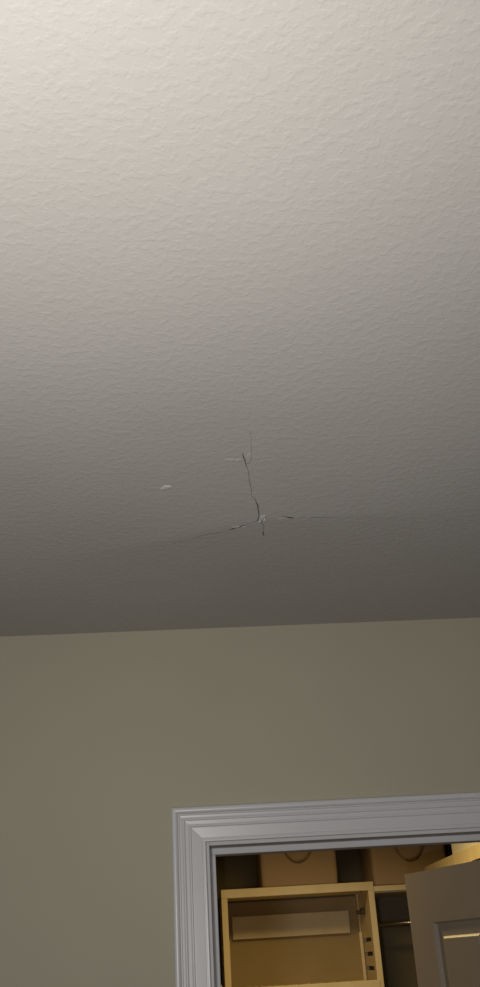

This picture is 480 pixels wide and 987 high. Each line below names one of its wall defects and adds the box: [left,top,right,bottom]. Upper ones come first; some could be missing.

crack [160,435,376,546]